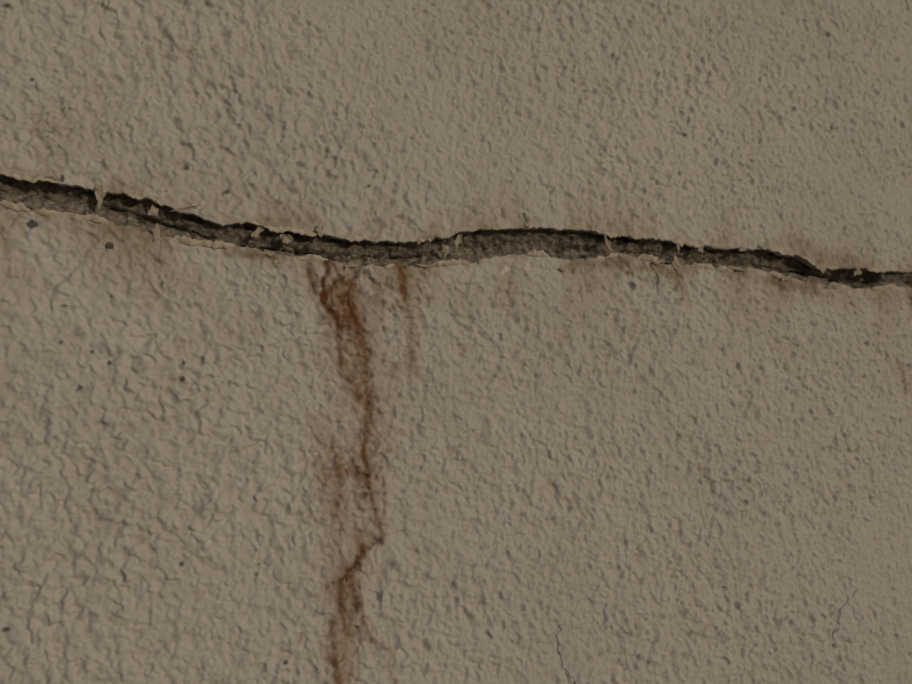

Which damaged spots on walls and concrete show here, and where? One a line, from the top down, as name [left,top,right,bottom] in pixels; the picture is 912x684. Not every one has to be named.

crack [0,171,912,291]
corrosion [320,260,368,364]
corrosion [339,545,365,594]